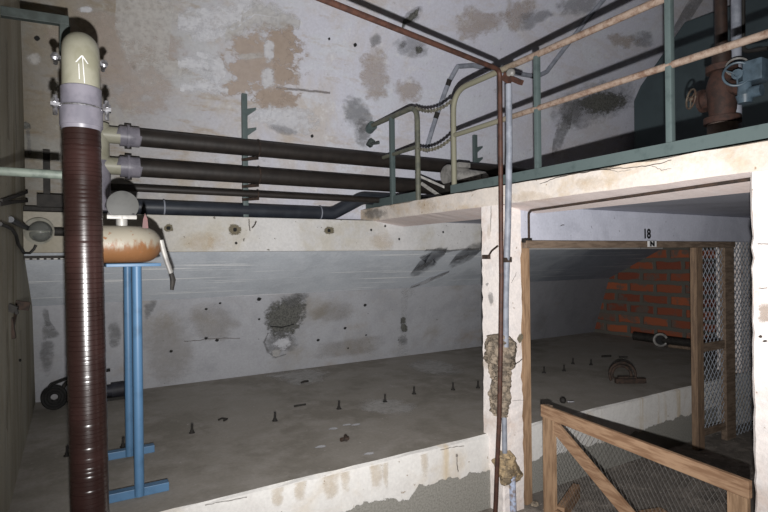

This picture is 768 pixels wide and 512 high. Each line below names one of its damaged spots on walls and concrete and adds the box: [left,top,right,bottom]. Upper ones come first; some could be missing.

peeling [220,21,303,109]
leakage [577,92,626,114]
crack [540,160,671,184]
spalling [483,334,523,418]
peeling [629,413,692,449]
peeling [347,450,543,512]
peeling [557,450,588,486]
peeling [580,442,642,471]